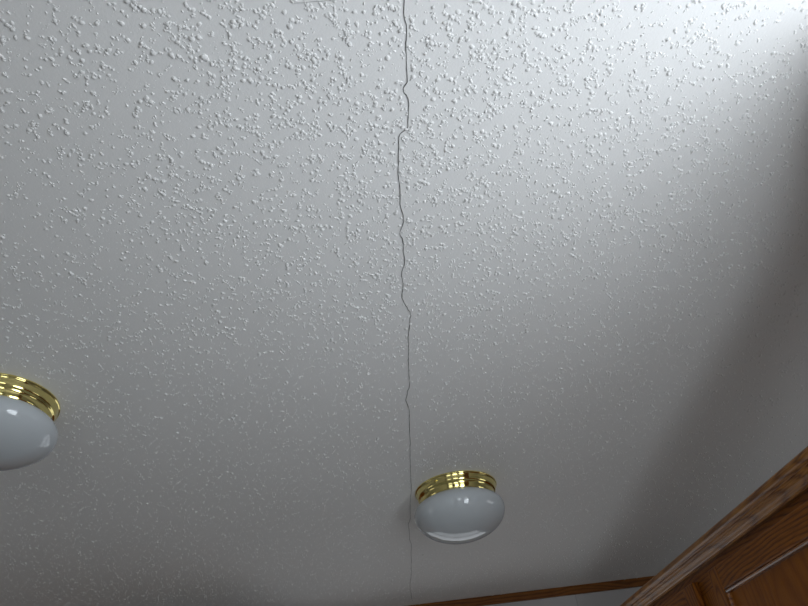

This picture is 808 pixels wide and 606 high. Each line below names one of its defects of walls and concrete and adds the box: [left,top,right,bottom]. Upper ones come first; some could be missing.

crack [398,0,411,445]